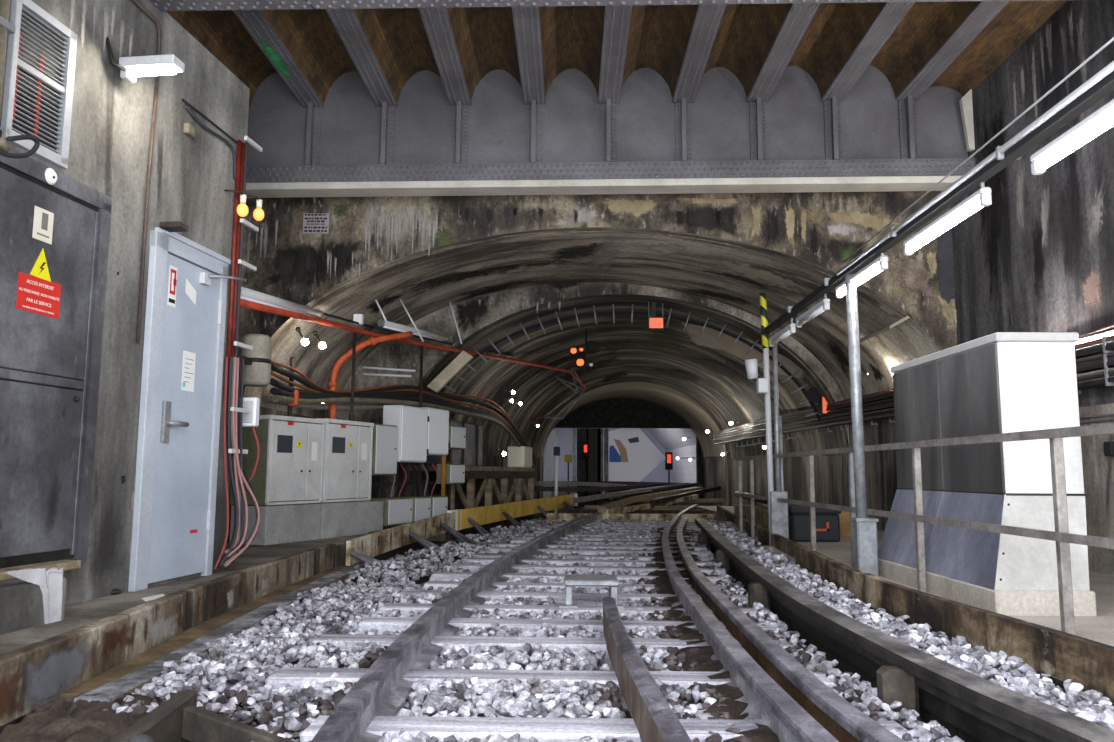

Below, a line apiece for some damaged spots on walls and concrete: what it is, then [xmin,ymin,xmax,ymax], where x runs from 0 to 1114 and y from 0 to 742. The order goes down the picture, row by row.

leakage [981,14,1086,160]
leakage [247,204,438,284]
leakage [465,205,597,230]
leakage [675,205,864,261]
leakage [980,167,1103,296]
leakage [699,270,768,289]
peeling [6,568,63,624]
corrosion [92,618,148,669]
corrosion [0,670,21,719]